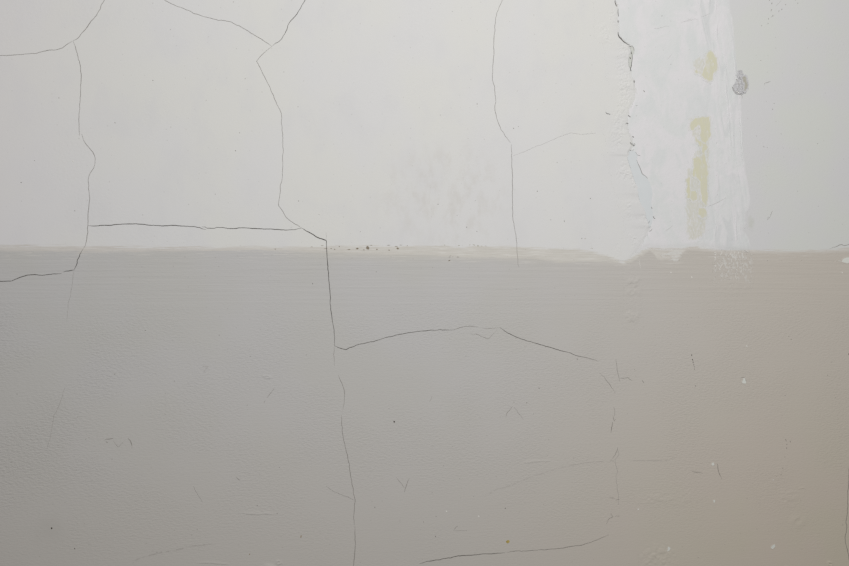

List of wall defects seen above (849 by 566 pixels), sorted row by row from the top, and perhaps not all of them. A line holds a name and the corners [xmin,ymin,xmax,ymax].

crack [0,0,631,389]
crack [423,409,620,563]